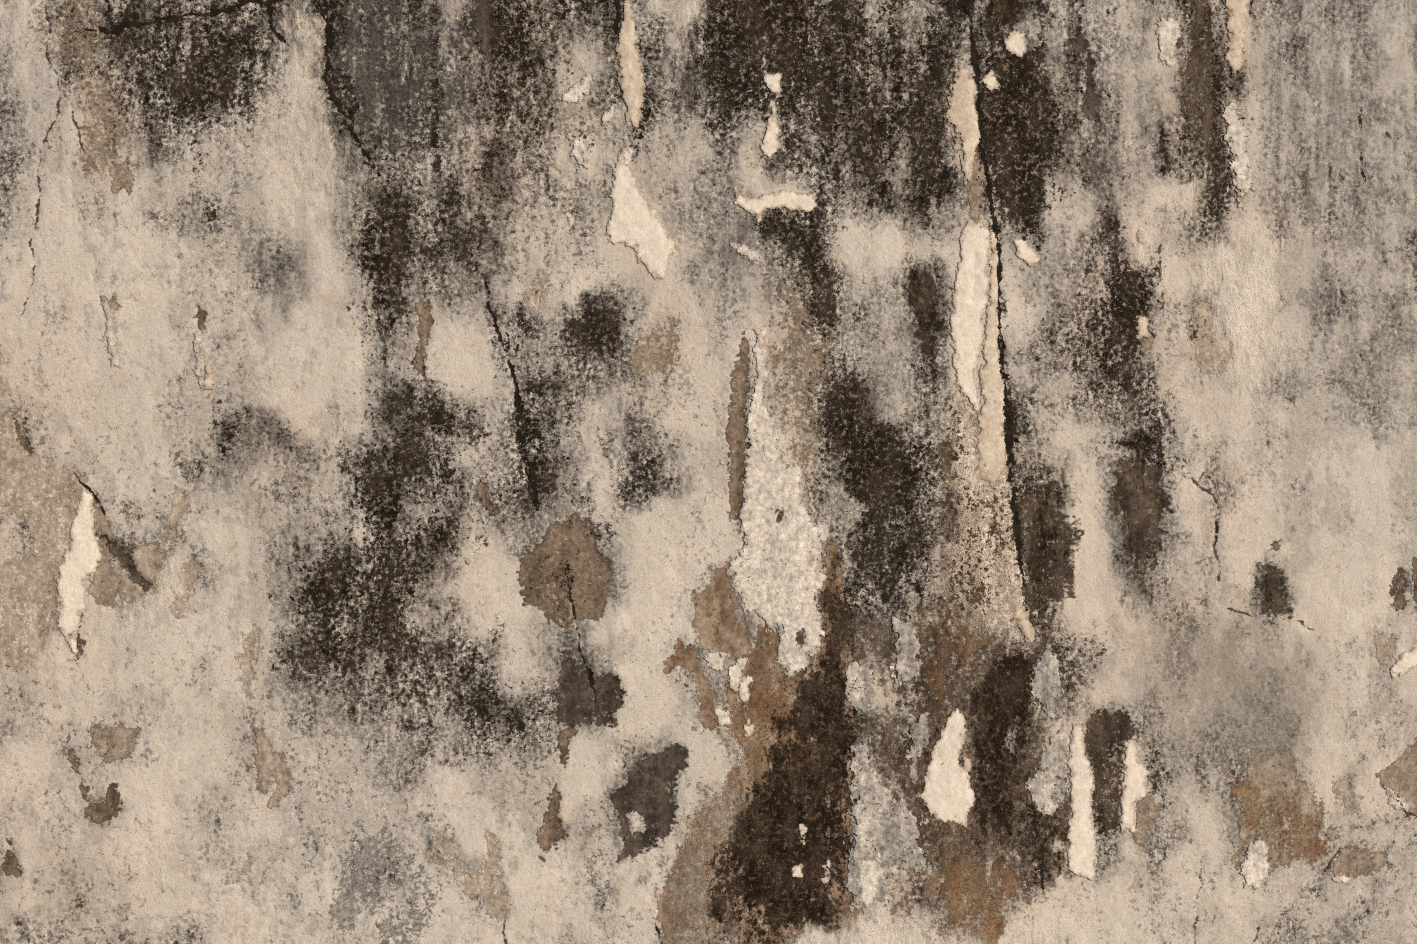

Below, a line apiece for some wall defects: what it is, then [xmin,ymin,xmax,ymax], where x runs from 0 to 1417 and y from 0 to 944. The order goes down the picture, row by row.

spalling [0,344,204,673]
crack [13,0,381,338]
water stain [28,0,681,759]
crack [481,273,542,510]
spalling [516,513,616,628]
crack [565,569,597,704]
spalling [601,327,976,944]
water stain [684,0,1107,944]
peeling [950,148,992,411]
crack [955,0,1037,638]
water stain [1037,211,1195,501]
water stain [1082,706,1167,840]